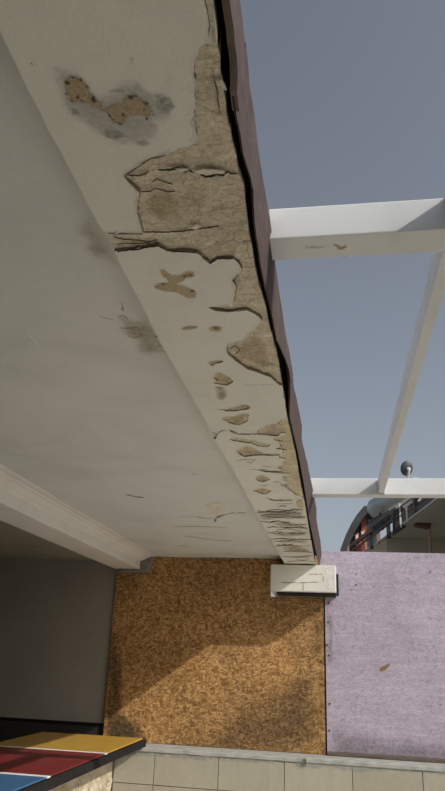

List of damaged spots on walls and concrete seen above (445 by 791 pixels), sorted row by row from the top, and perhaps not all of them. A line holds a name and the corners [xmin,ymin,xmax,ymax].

spalling [106,44,282,385]
peeling [212,404,303,501]